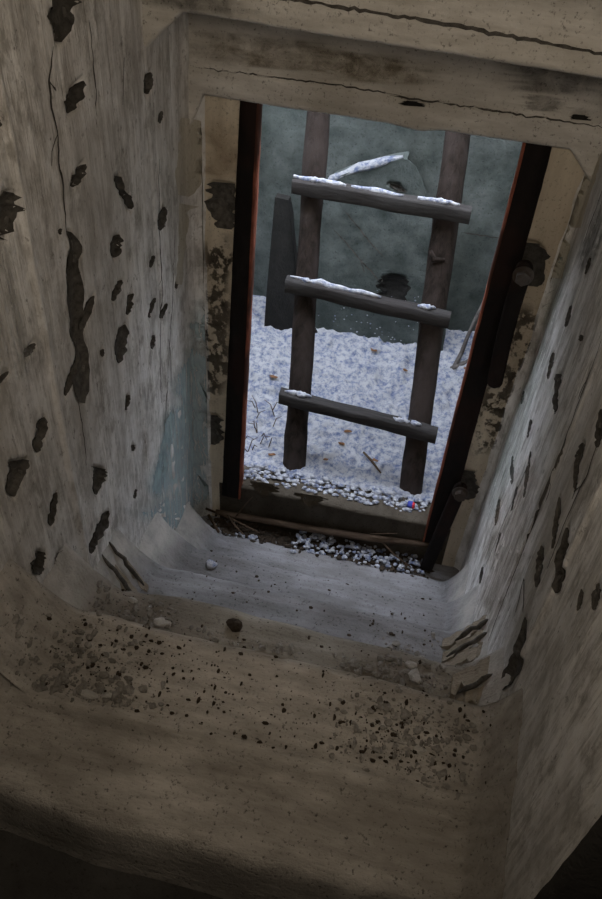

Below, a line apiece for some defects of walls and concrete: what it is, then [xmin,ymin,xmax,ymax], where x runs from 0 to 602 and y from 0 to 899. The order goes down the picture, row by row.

spalling [47,0,82,42]
crack [282,0,602,56]
spalling [58,228,95,403]
spalling [100,280,134,363]
spalling [148,298,168,318]
spalling [6,417,48,497]
spalling [534,497,569,593]
spalling [441,615,490,705]
spalling [501,617,527,690]